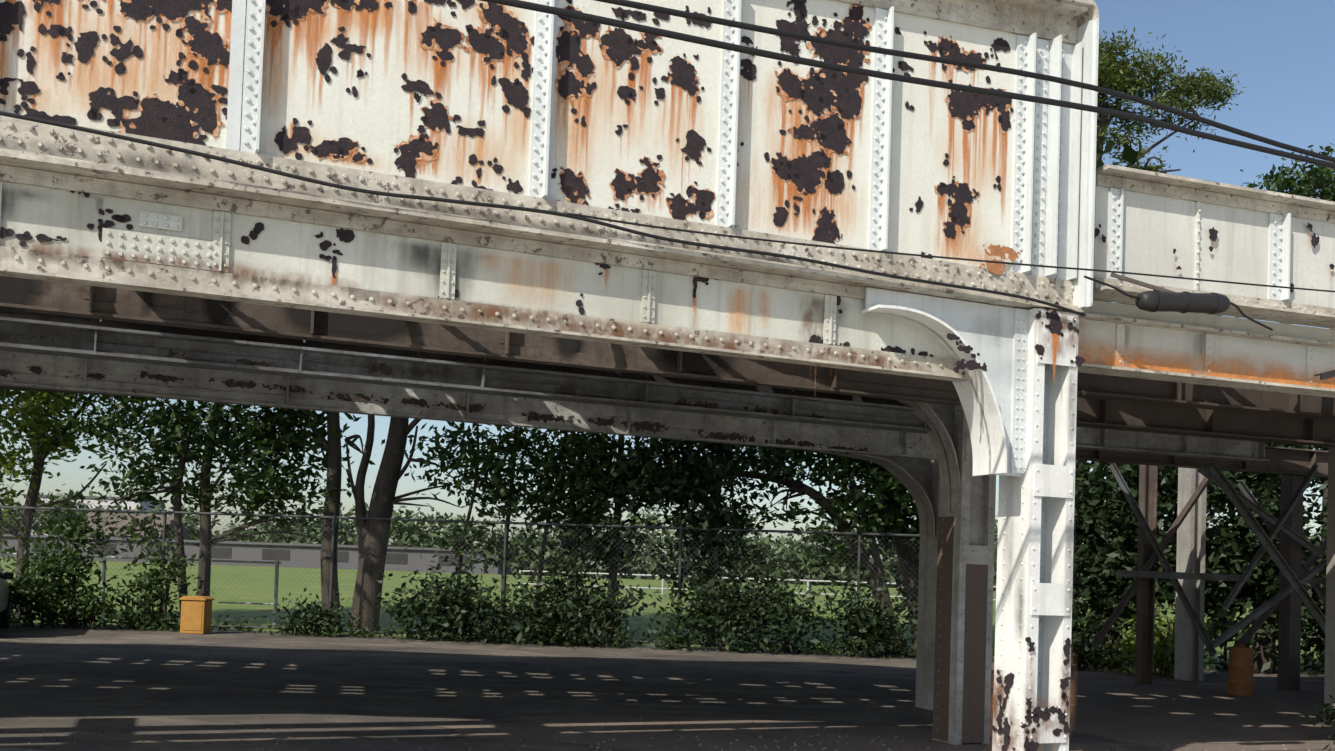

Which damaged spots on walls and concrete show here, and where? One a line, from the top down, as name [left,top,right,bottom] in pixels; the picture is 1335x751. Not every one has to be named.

corrosion [35,7,50,37]
corrosion [175,33,205,70]
corrosion [263,39,280,88]
peeling [265,0,392,97]
corrosion [352,0,385,27]
peeling [394,0,535,178]
peeling [555,0,711,148]
peeling [764,0,872,244]
peeling [909,31,1015,241]
peeling [608,155,715,220]
corrosion [978,244,1020,275]
corrosion [1078,349,1335,389]